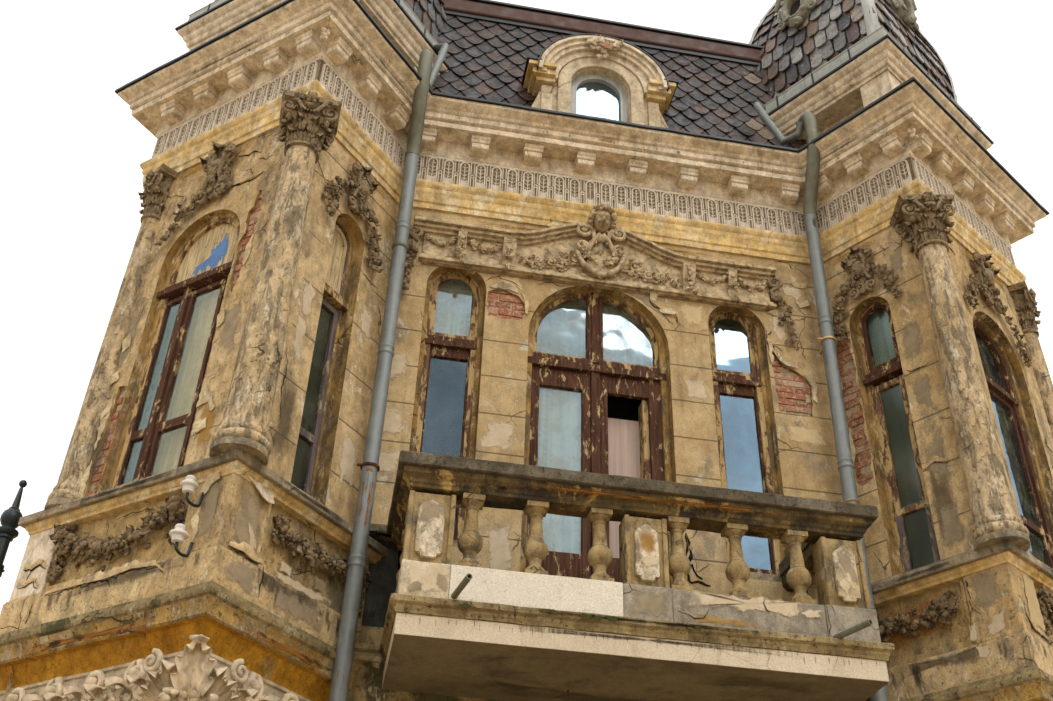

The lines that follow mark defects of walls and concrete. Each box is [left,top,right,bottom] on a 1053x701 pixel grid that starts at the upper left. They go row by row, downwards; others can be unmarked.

flaking render [487,276,529,320]
flaking render [767,309,826,446]
flaking render [837,332,873,486]
flaking render [642,535,657,567]
crack [679,533,711,619]
peeling [689,590,822,625]